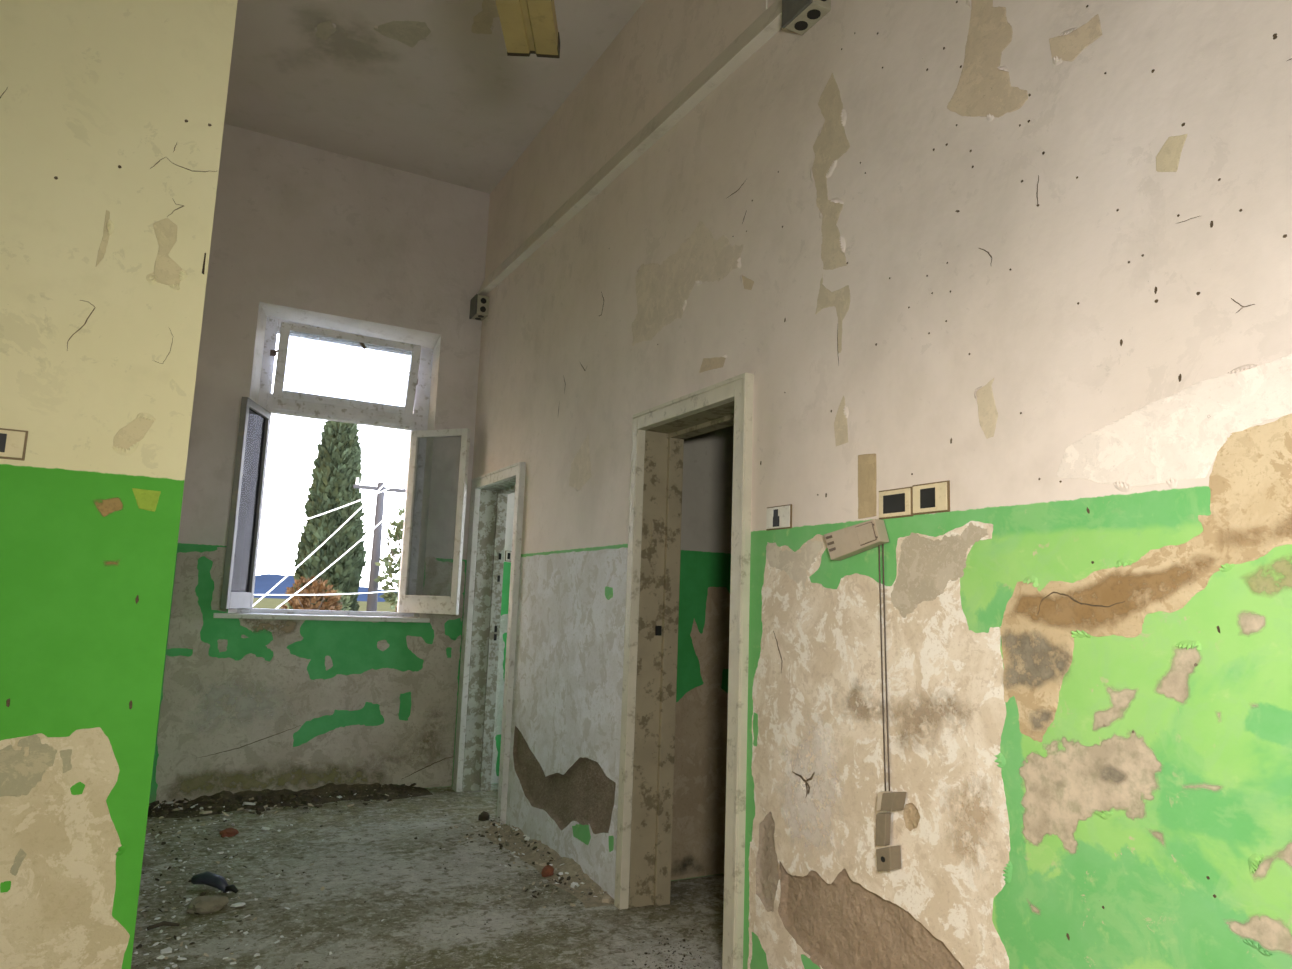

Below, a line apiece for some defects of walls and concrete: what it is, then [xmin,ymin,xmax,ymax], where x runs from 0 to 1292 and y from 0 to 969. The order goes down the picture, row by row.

crack [67,300,95,349]
peeling [112,413,156,456]
peeling [146,218,206,290]
crack [150,143,216,172]
peeling [810,73,850,353]
peeling [947,0,1031,127]
peeling [156,547,465,814]
peeling [491,547,628,899]
peeling [747,354,1292,969]
peeling [0,727,130,969]